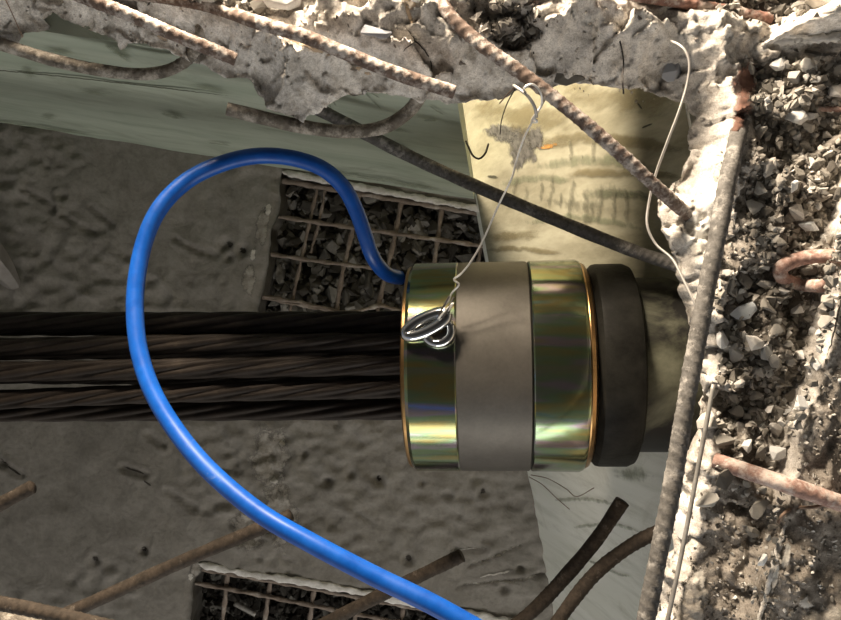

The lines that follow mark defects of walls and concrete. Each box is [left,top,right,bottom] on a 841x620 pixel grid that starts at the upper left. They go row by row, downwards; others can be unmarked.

spalling [734,7,774,24]
peeling [761,31,841,47]
corrosion [732,63,759,132]
spalling [0,0,678,272]
spalling [227,178,401,311]
spalling [772,249,841,293]
spalling [435,0,751,620]
spalling [712,453,841,512]
spalling [401,548,484,585]
peeling [757,522,791,620]
spalling [800,598,841,620]